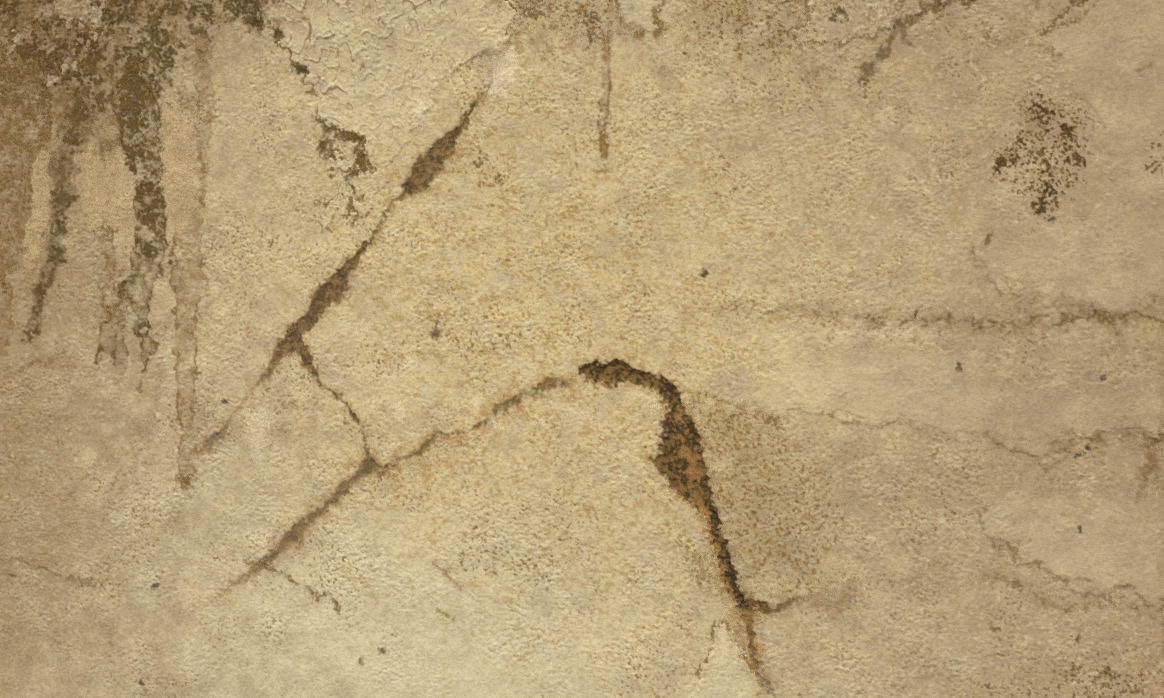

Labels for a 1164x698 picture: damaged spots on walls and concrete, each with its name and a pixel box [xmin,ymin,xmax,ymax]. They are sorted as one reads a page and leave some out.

damp [0,0,284,371]
peeling [259,0,517,232]
damp [991,88,1092,216]
damp [172,346,201,488]
crack [246,71,795,662]